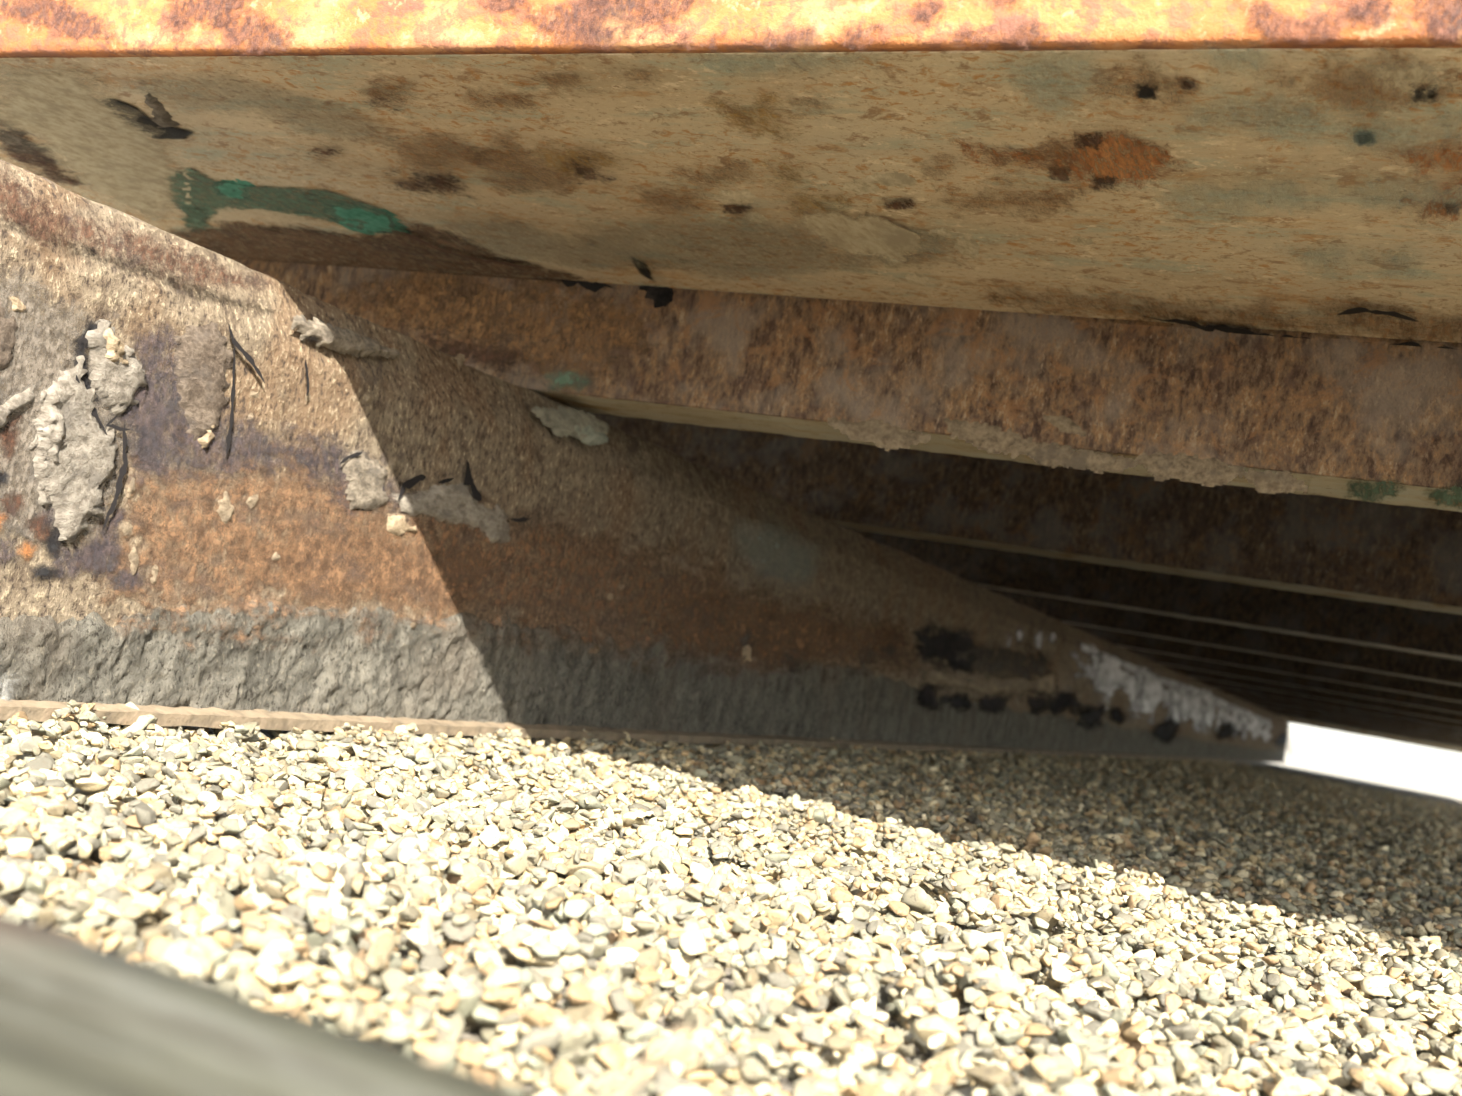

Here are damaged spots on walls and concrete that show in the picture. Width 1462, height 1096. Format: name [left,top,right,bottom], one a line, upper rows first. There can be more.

rust [0,0,113,40]
rust [164,0,291,53]
rust [480,0,694,46]
rust [1247,0,1462,40]
rust [923,131,1185,216]
peeling [0,295,26,371]
peeling [73,319,148,431]
peeling [532,371,609,446]
spalling [0,378,160,589]
peeling [339,450,530,544]
water stain [1008,629,1056,648]
water stain [1070,643,1273,742]